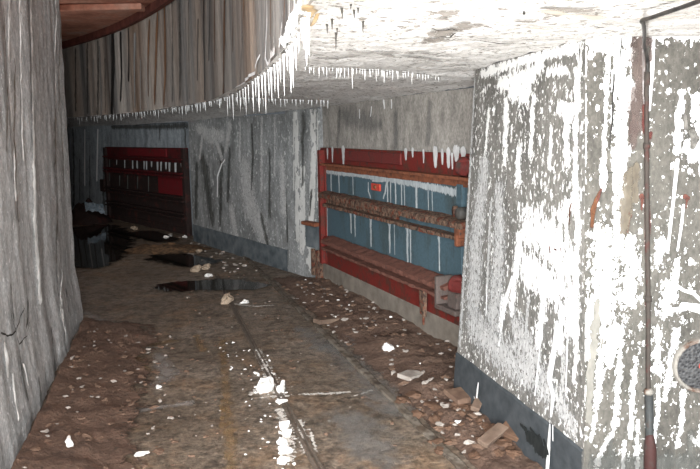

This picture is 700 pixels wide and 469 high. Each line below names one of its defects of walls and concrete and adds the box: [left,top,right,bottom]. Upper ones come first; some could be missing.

peeling [316,10,484,68]
peeling [513,7,613,23]
peeling [650,36,700,47]
corrosion [627,36,653,149]
peeling [480,39,618,206]
spalling [683,113,700,150]
leakage [112,109,318,269]
corrosion [590,188,603,228]
peeling [585,214,696,425]
spalling [520,423,549,459]